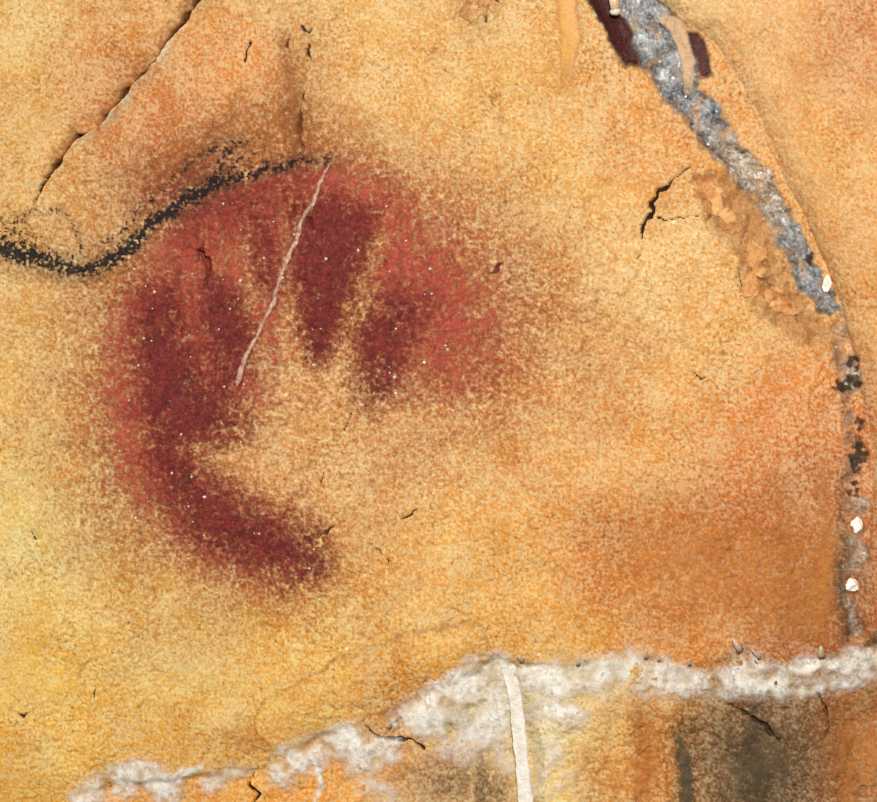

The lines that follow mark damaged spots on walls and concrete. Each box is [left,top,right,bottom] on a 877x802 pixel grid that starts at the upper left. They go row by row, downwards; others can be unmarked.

crack [286,25,313,60]
crack [36,0,201,201]
crack [283,92,306,155]
crack [637,167,712,259]
damp [392,654,510,762]
damp [517,640,877,721]
damp [70,762,252,802]
damp [270,725,398,798]
damp [676,737,693,802]
damp [703,712,811,802]